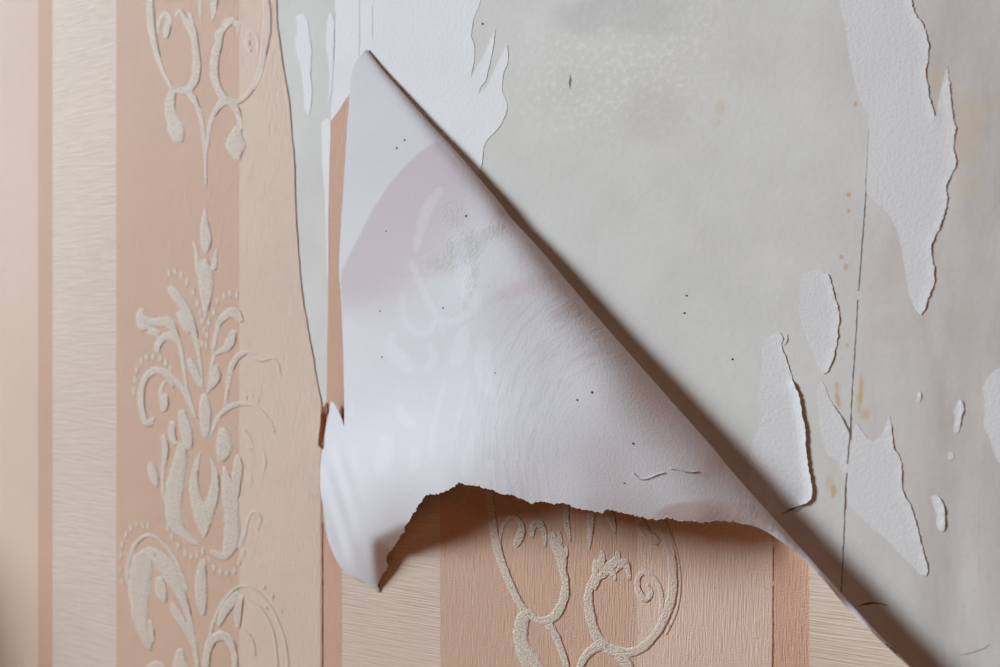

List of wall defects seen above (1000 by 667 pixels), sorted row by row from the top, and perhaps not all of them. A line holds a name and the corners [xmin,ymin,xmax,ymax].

peeling [840,0,956,314]
peeling [318,49,928,667]
peeling [931,495,945,532]
peeling [953,400,964,433]